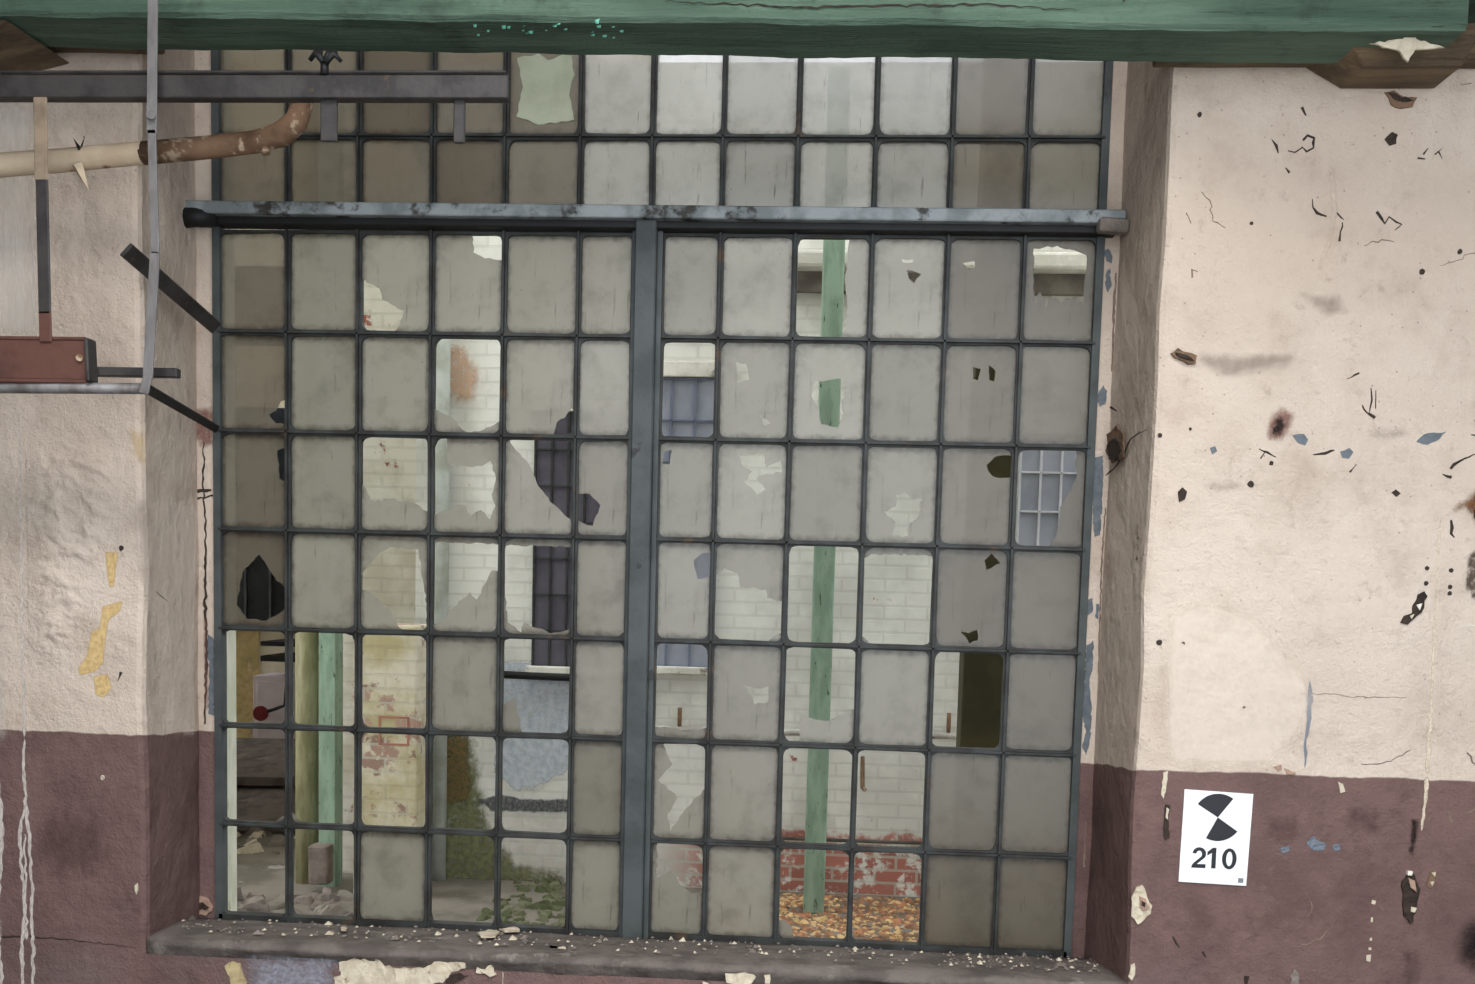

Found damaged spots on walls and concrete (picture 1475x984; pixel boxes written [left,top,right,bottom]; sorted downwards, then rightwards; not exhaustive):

crack [1442,434,1475,479]
crack [1448,520,1456,538]
leakage [0,419,36,984]
peeling [1131,885,1152,924]
spalling [1401,870,1437,924]
peeling [224,961,247,984]
peeling [334,958,496,984]